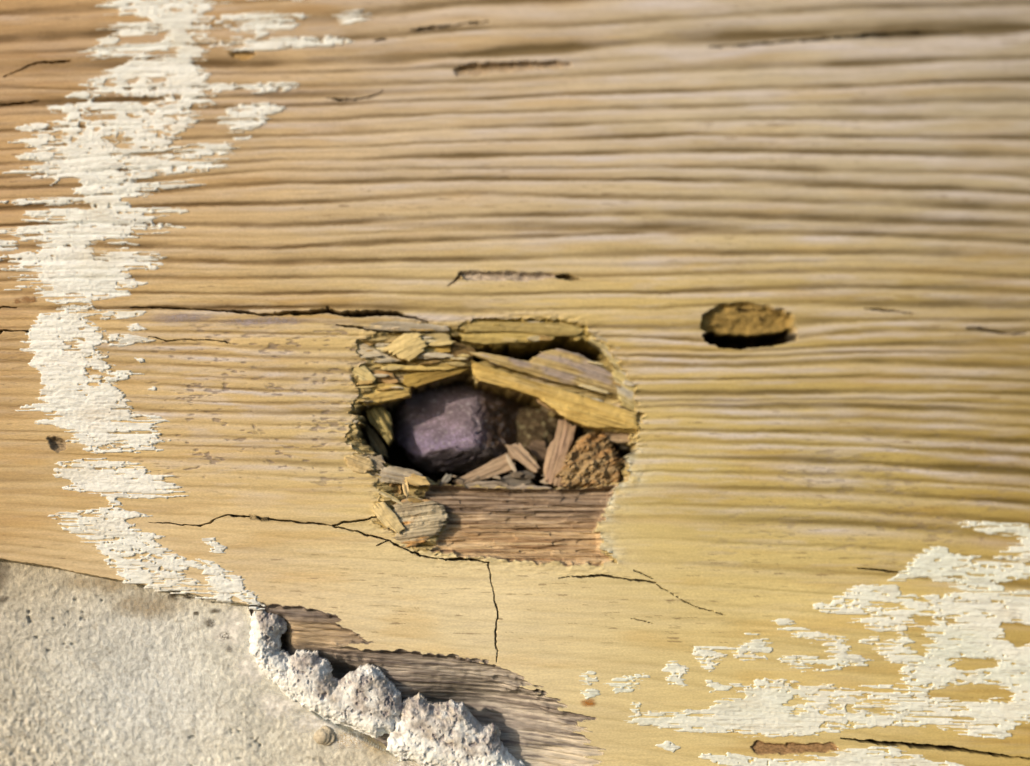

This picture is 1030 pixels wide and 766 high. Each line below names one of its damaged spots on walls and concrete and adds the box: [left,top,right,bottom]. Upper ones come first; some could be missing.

peeling [331,10,372,25]
crack [0,306,31,335]
peeling [0,0,355,610]
spalling [344,317,646,568]
crack [148,514,499,663]
crack [558,569,727,616]
damp [193,608,265,683]
peeling [579,520,1030,753]
damp [259,694,386,750]
peeling [698,746,964,766]